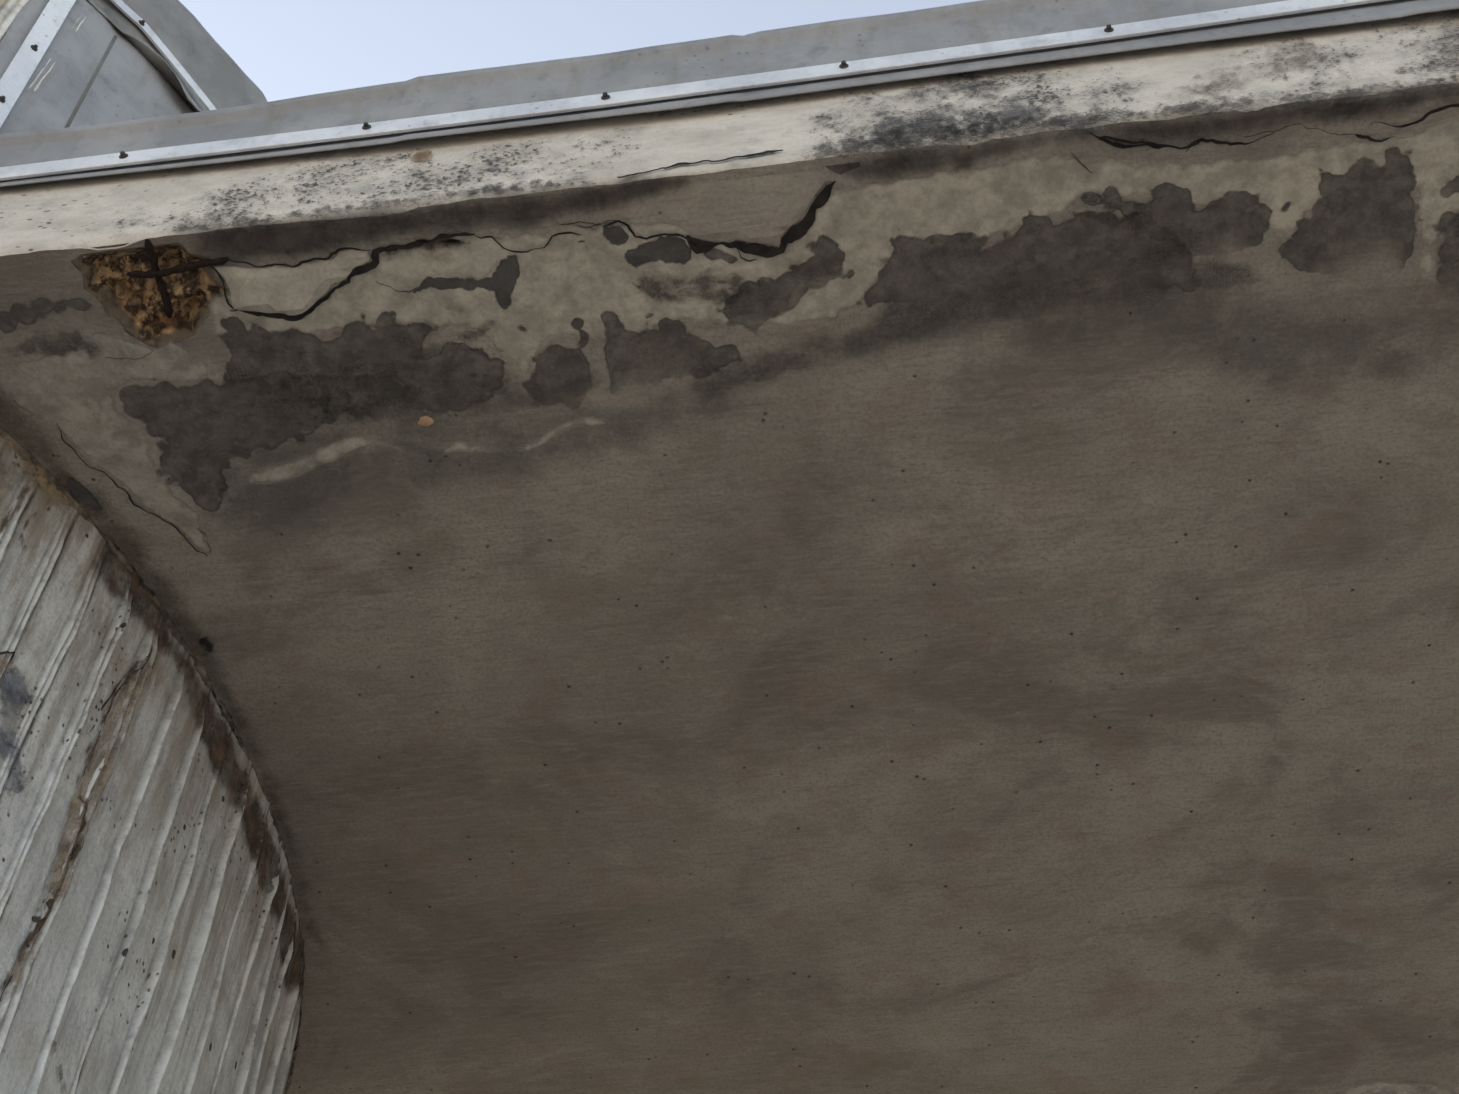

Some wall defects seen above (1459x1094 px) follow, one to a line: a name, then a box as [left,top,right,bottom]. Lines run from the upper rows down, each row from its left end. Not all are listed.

water stain [1184,12,1459,104]
crack [617,149,783,178]
water stain [787,64,1156,159]
crack [1064,104,1459,173]
spalling [71,236,504,349]
crack [212,181,835,321]
water stain [0,118,1459,553]